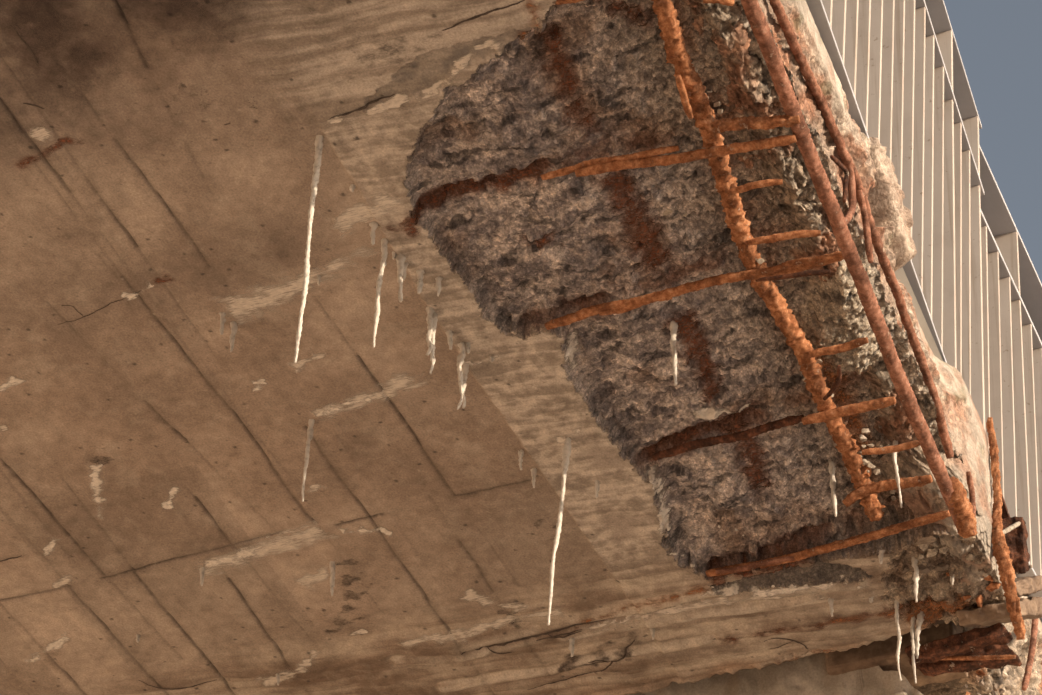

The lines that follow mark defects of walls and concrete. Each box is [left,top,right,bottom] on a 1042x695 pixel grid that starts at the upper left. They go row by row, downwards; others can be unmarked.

crack [442,0,525,31]
damp [333,194,402,237]
corrosion [601,169,671,271]
damp [219,248,375,325]
corrosion [665,312,722,402]
spalling [402,0,1039,691]
damp [312,373,426,418]
corrosion [646,410,773,489]
damp [198,520,392,576]
crack [461,619,605,655]
crack [527,640,635,690]
corrosion [809,595,974,629]